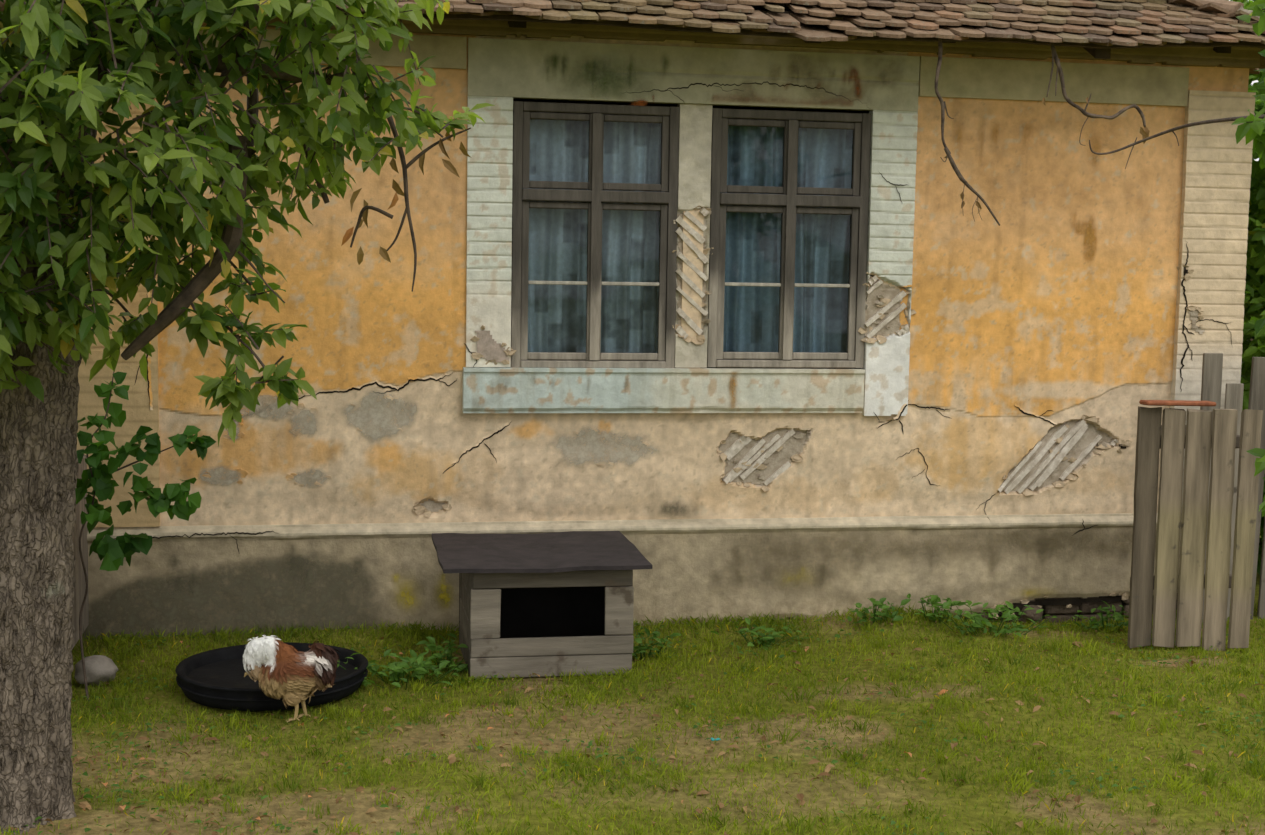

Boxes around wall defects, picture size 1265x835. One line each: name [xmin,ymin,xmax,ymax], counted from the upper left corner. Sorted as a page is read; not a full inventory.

crack [625,81,867,104]
spalling [672,206,714,345]
spalling [858,275,916,344]
crack [298,343,477,399]
spalling [470,325,517,365]
crack [1014,403,1058,425]
crack [443,420,512,473]
spalling [717,428,811,492]
spalling [998,414,1132,496]